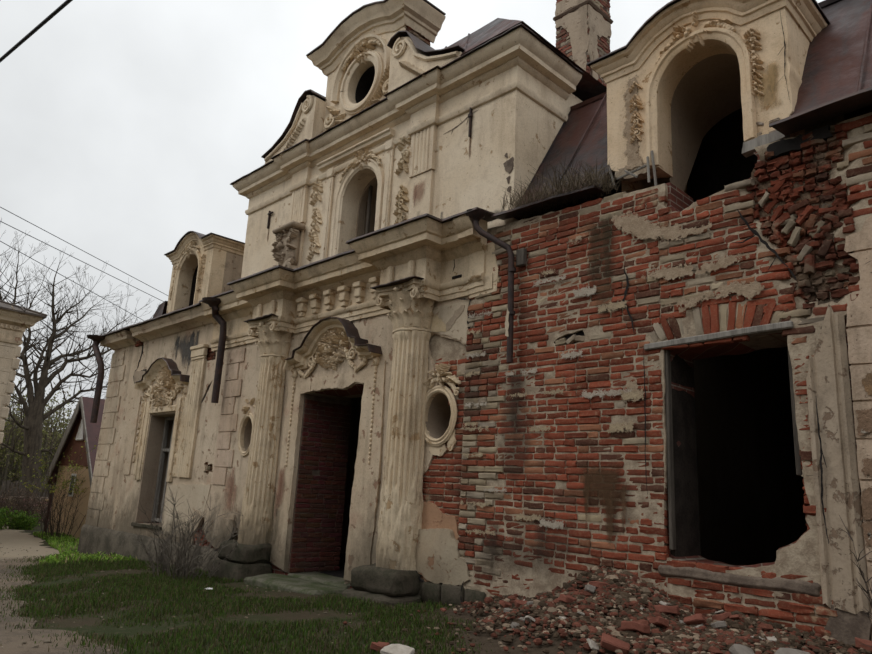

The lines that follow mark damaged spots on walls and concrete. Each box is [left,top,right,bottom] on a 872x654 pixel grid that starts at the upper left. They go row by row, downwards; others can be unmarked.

crack [777,13,791,103]
crack [733,209,797,280]
spalling [422,73,872,637]
leakage [583,467,627,543]
crack [816,398,829,544]